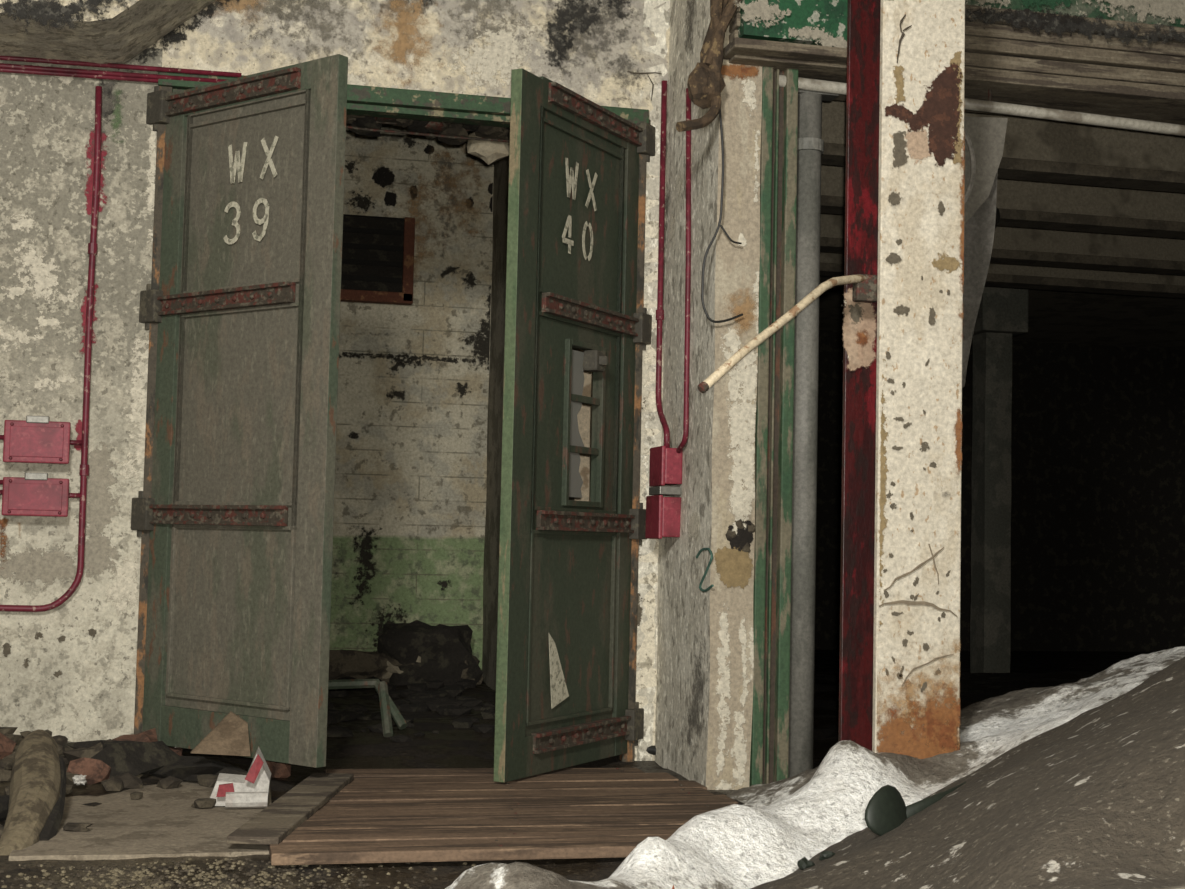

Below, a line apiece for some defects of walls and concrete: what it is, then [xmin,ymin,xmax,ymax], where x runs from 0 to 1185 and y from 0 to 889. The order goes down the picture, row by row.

water stain [0,0,129,32]
peeling [734,0,847,48]
peeling [977,0,1185,25]
water stain [542,0,641,100]
peeling [892,131,909,169]
rust [885,51,965,293]
peeling [888,192,901,205]
peeling [886,239,902,266]
peeling [921,251,962,280]
rust [954,409,963,471]
rust [876,665,960,759]